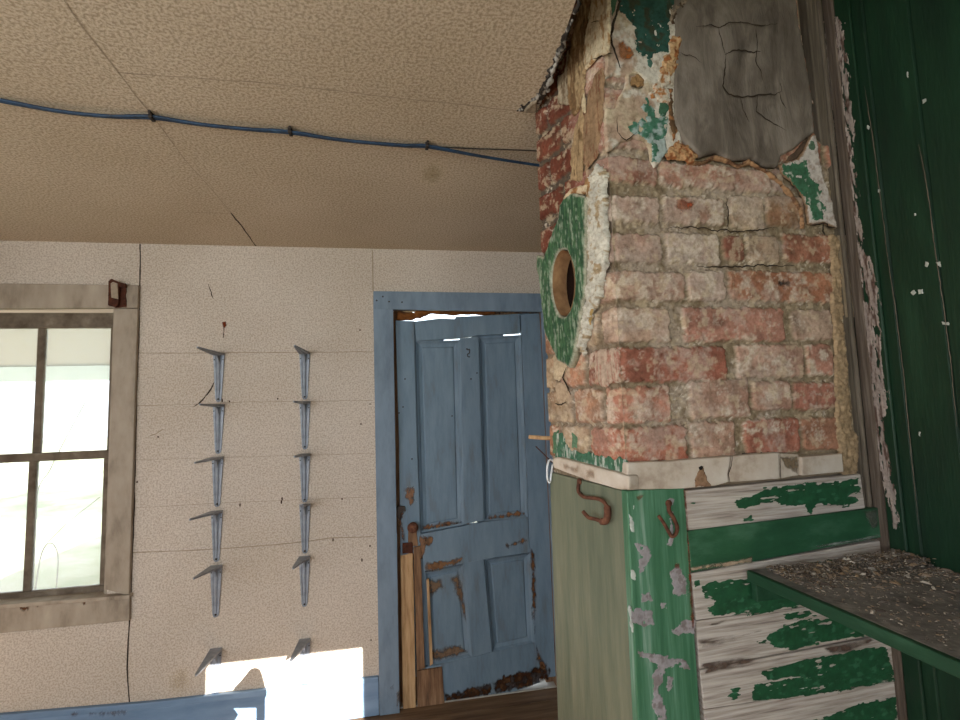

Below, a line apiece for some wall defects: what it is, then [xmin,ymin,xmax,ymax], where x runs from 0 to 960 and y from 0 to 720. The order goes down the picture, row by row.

crack [64,0,525,246]
crack [696,21,787,130]
flaking render [557,0,837,387]
crack [668,202,776,233]
crack [698,262,793,270]
peeling [825,17,900,529]
crack [131,244,375,592]
peeling [735,457,861,522]
crack [124,620,132,702]
peeling [638,649,690,720]
peeling [628,558,895,701]
peeling [815,697,898,720]